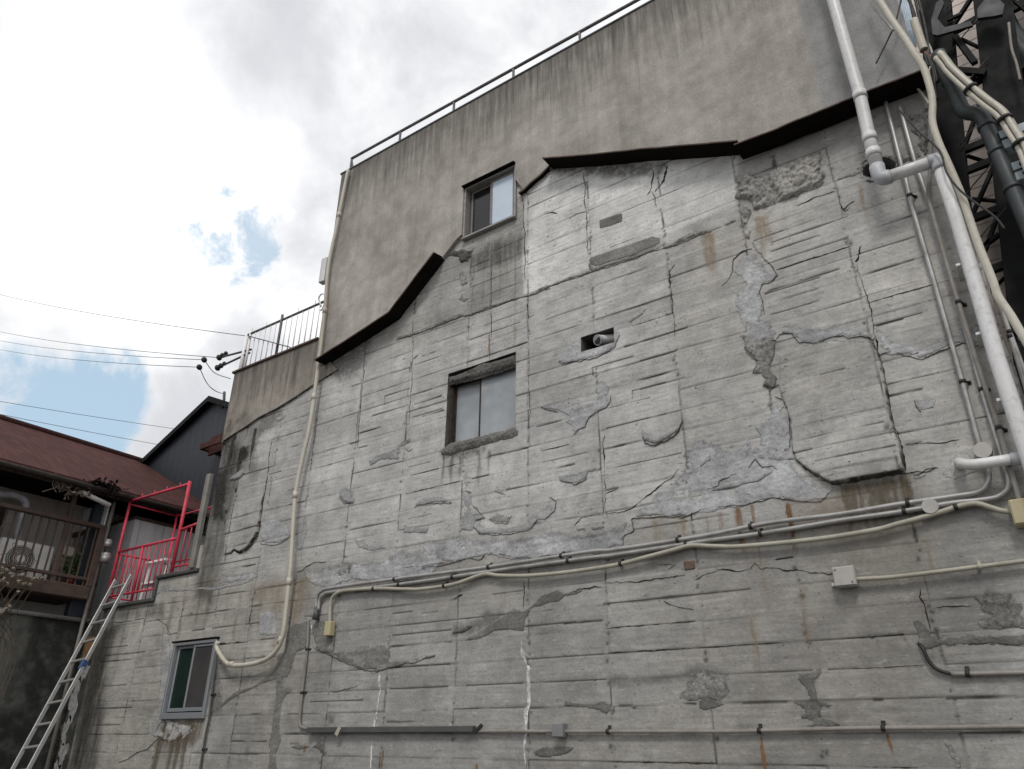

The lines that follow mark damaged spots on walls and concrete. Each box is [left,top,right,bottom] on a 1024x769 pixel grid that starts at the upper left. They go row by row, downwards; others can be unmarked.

spalling [397,151,874,340]
damp [222,428,257,470]
damp [214,472,237,523]
peeling [711,470,773,491]
spalling [973,589,1024,630]
damp [520,648,531,764]
spalling [680,669,730,701]